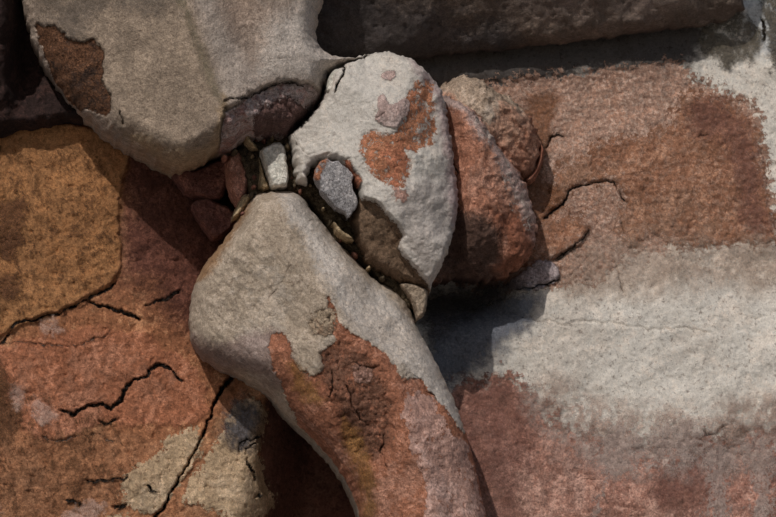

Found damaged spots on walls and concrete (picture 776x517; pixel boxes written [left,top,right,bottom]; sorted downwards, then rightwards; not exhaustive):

crack [759,19,767,40]
crack [544,181,625,219]
crack [0,283,179,347]
crack [44,363,183,442]
crack [87,474,128,484]
crack [146,377,233,517]